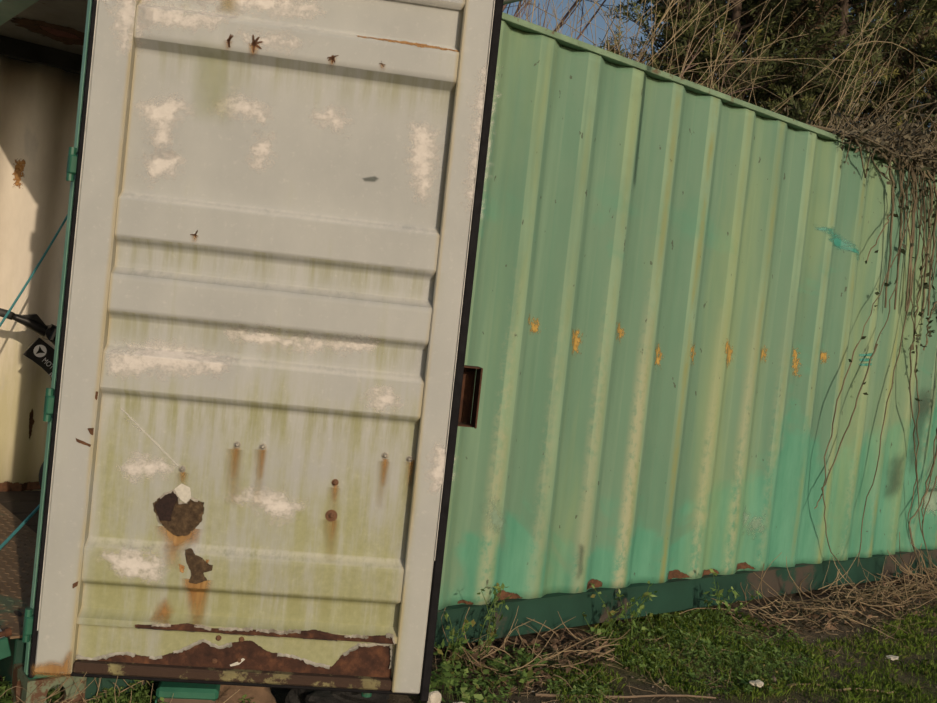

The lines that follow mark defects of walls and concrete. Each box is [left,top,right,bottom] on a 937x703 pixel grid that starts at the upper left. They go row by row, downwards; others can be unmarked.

rust [251,35,263,54]
peeling [215,96,268,123]
peeling [138,98,187,177]
rust [13,158,26,189]
rust [570,330,583,353]
rust [164,528,213,614]
rust [586,579,602,591]
rust [668,570,690,579]